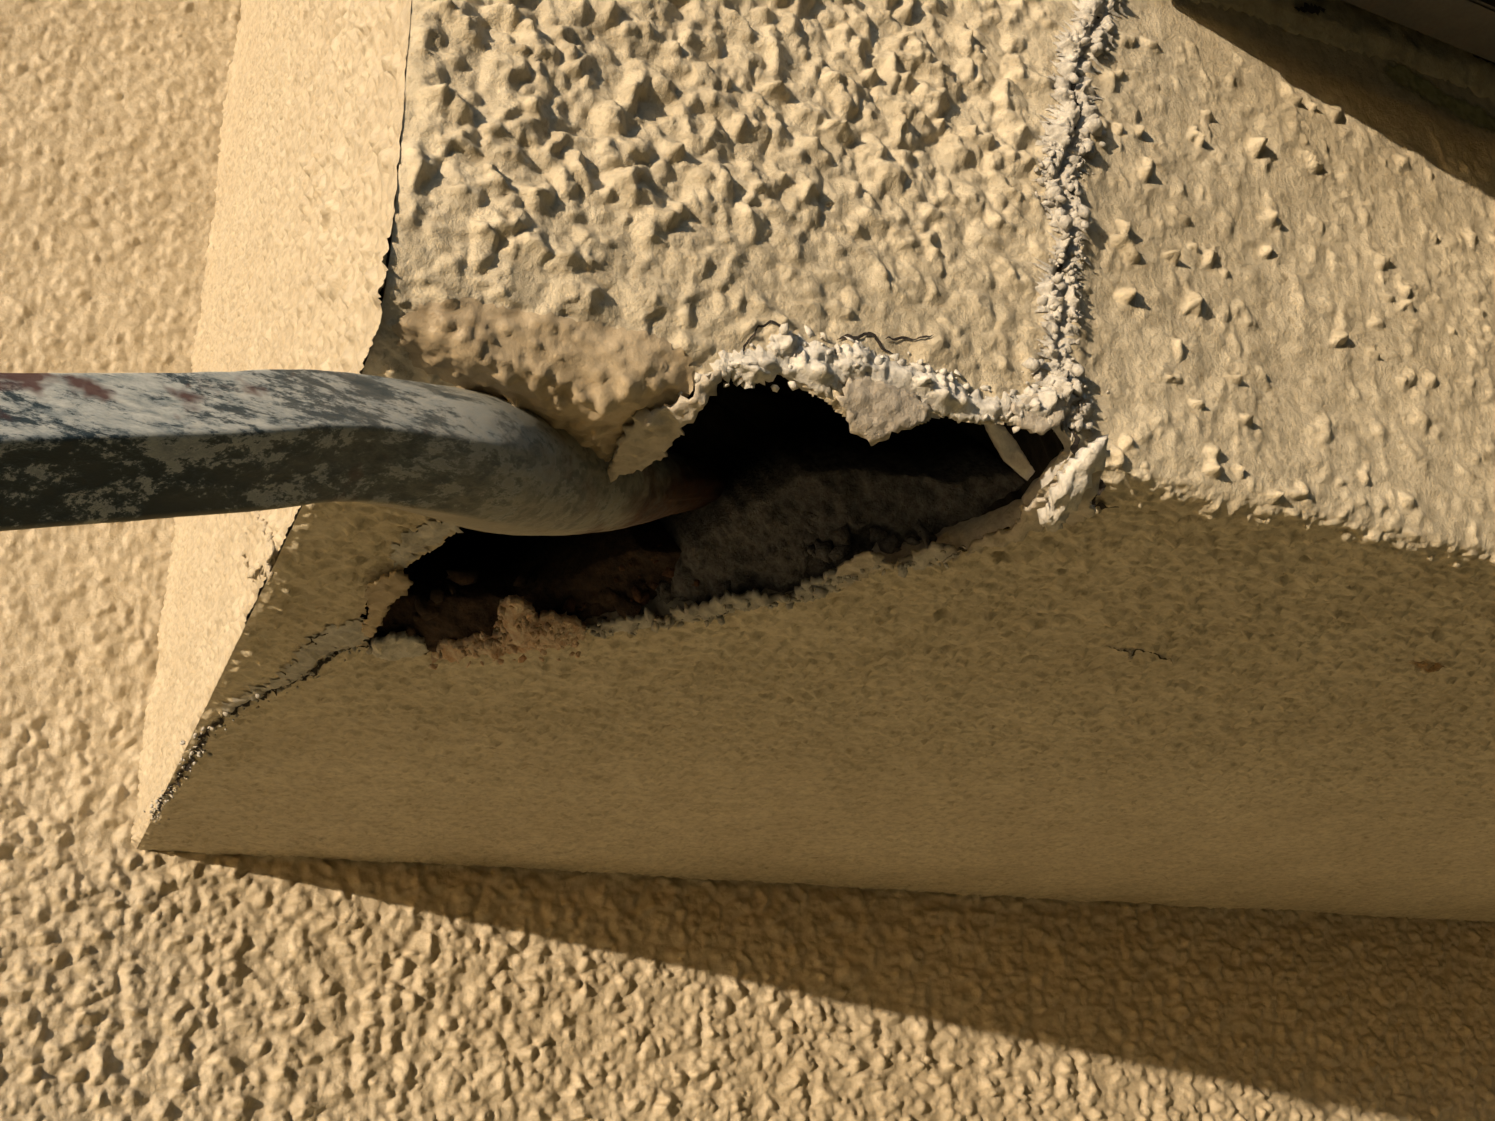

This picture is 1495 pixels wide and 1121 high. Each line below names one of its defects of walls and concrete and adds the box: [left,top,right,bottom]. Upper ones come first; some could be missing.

crack [1021,0,1128,510]
spalling [221,323,1110,713]
crack [143,633,373,825]